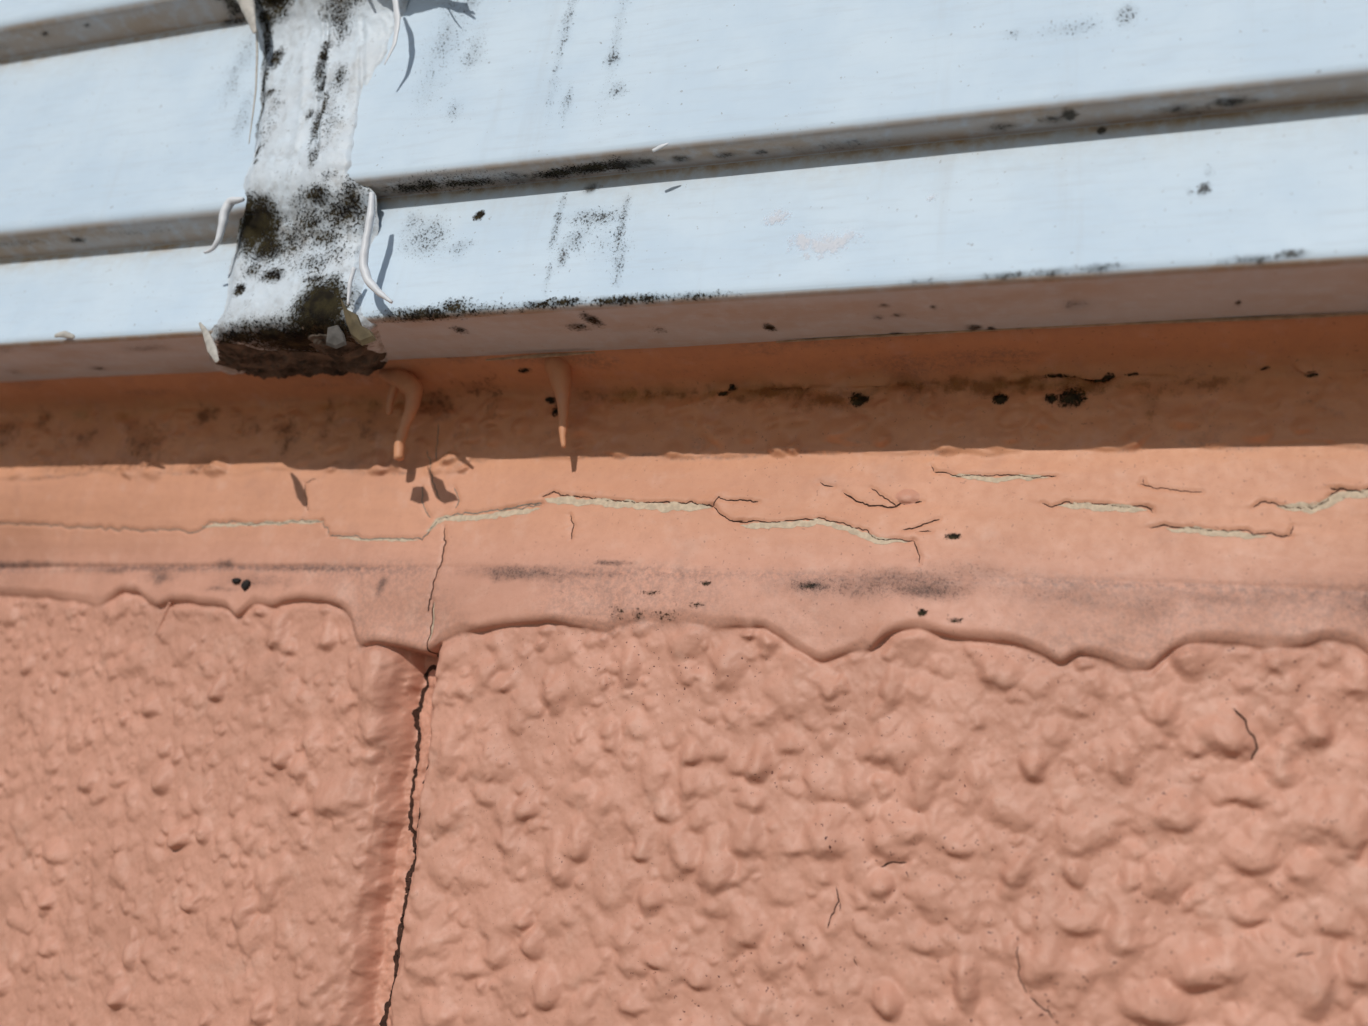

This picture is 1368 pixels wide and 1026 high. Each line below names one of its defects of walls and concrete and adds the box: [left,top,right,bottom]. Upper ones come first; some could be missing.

peeling [384,0,400,65]
peeling [236,0,258,144]
leakage [1048,110,1078,121]
leakage [1216,98,1244,106]
leakage [214,0,733,380]
peeling [203,197,245,254]
peeling [347,192,393,305]
leakage [1239,250,1302,263]
leakage [848,392,869,407]
leakage [992,393,1009,405]
leakage [1045,372,1138,408]
crack [0,424,1368,1026]